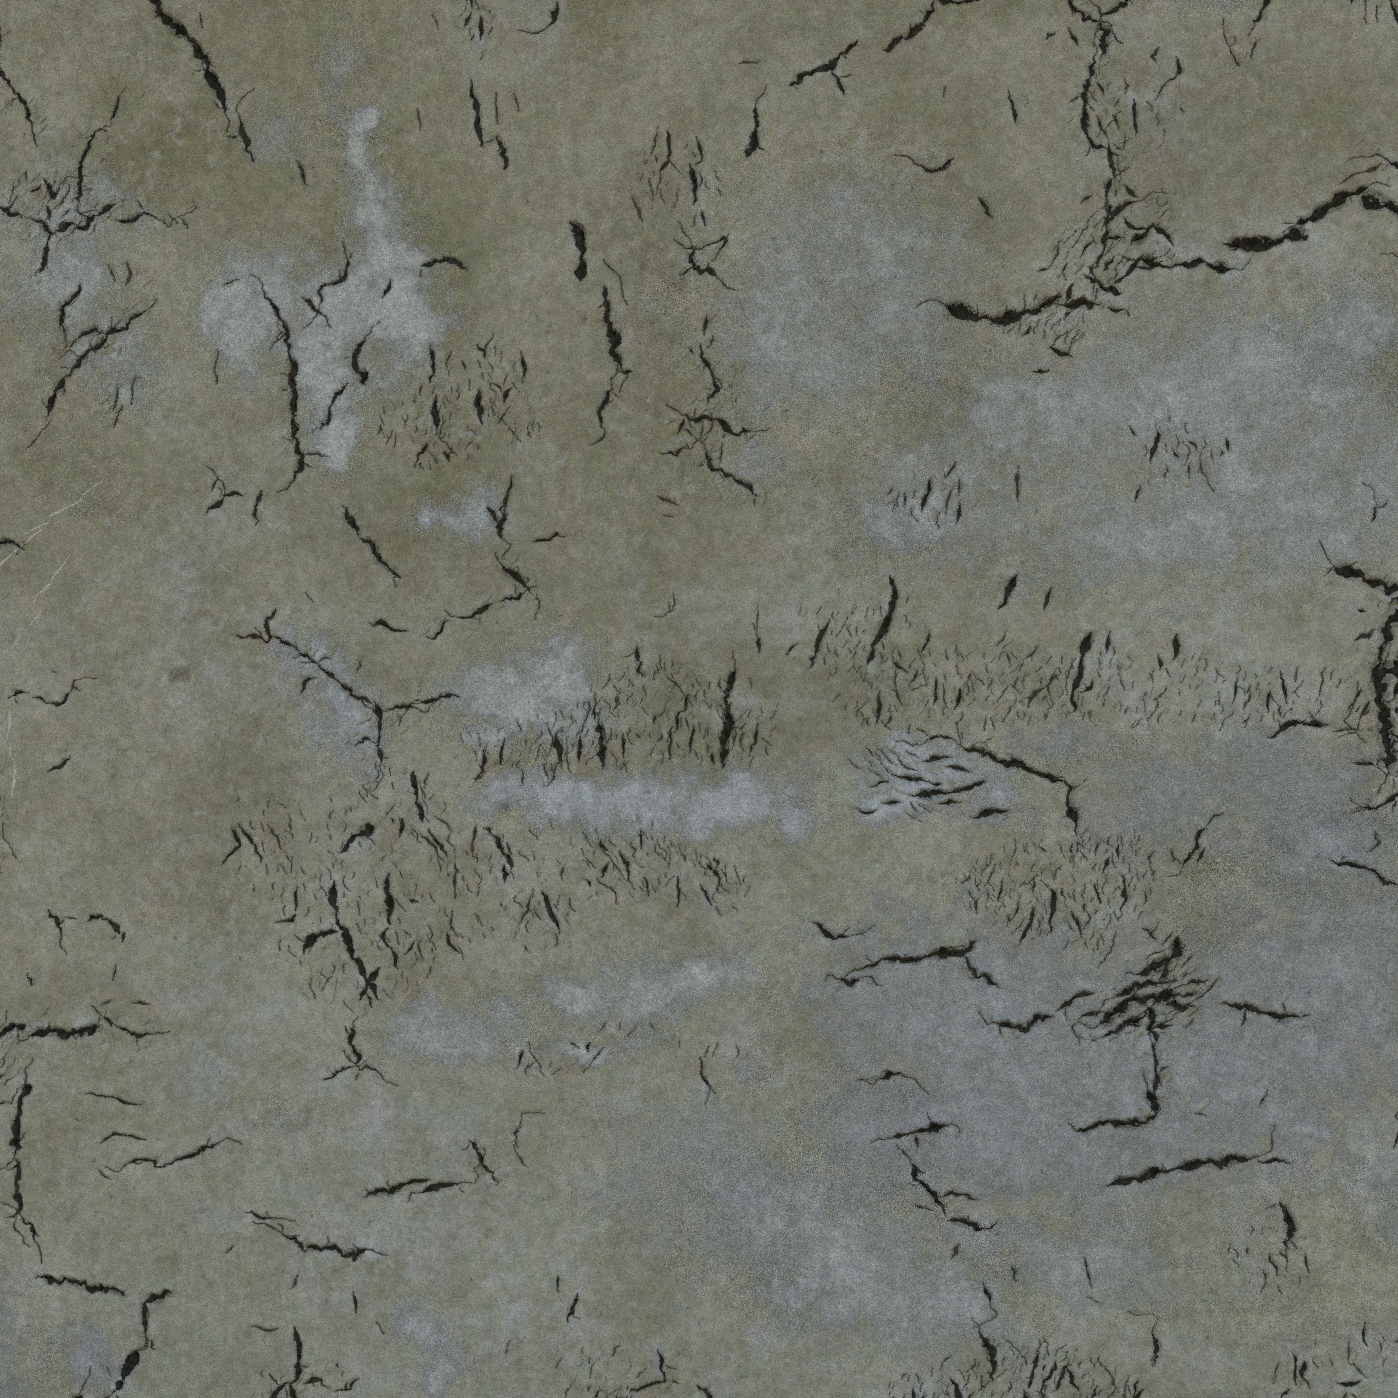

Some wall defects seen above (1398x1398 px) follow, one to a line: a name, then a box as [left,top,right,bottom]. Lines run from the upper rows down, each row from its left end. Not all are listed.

crack [0,27,197,448]
crack [149,0,255,162]
crack [661,220,769,506]
crack [917,0,1398,328]
crack [369,475,565,640]
crack [236,609,462,792]
crack [1269,540,1398,891]
crack [0,909,171,1398]
crack [225,1211,388,1335]
crack [365,1112,545,1201]
crack [856,1070,997,1259]
crack [813,922,1315,1186]